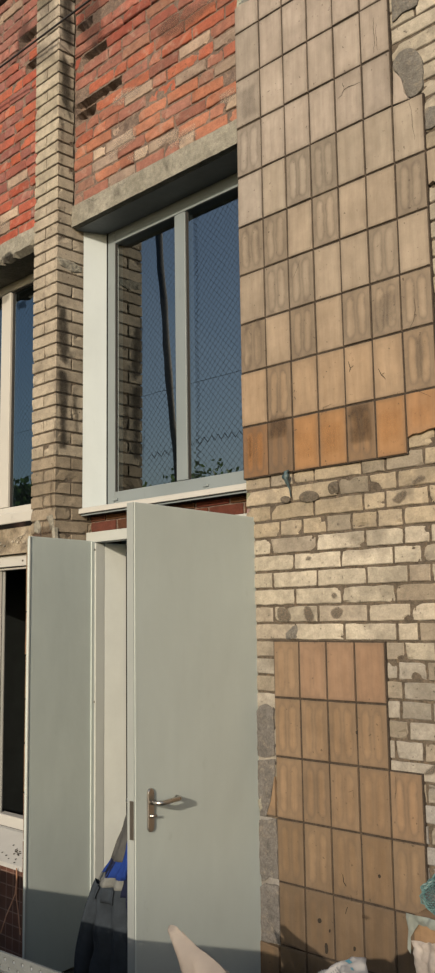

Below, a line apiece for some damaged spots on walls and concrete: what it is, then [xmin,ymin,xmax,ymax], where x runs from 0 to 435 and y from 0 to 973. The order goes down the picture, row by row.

spalling [391,0,419,23]
spalling [393,48,424,98]